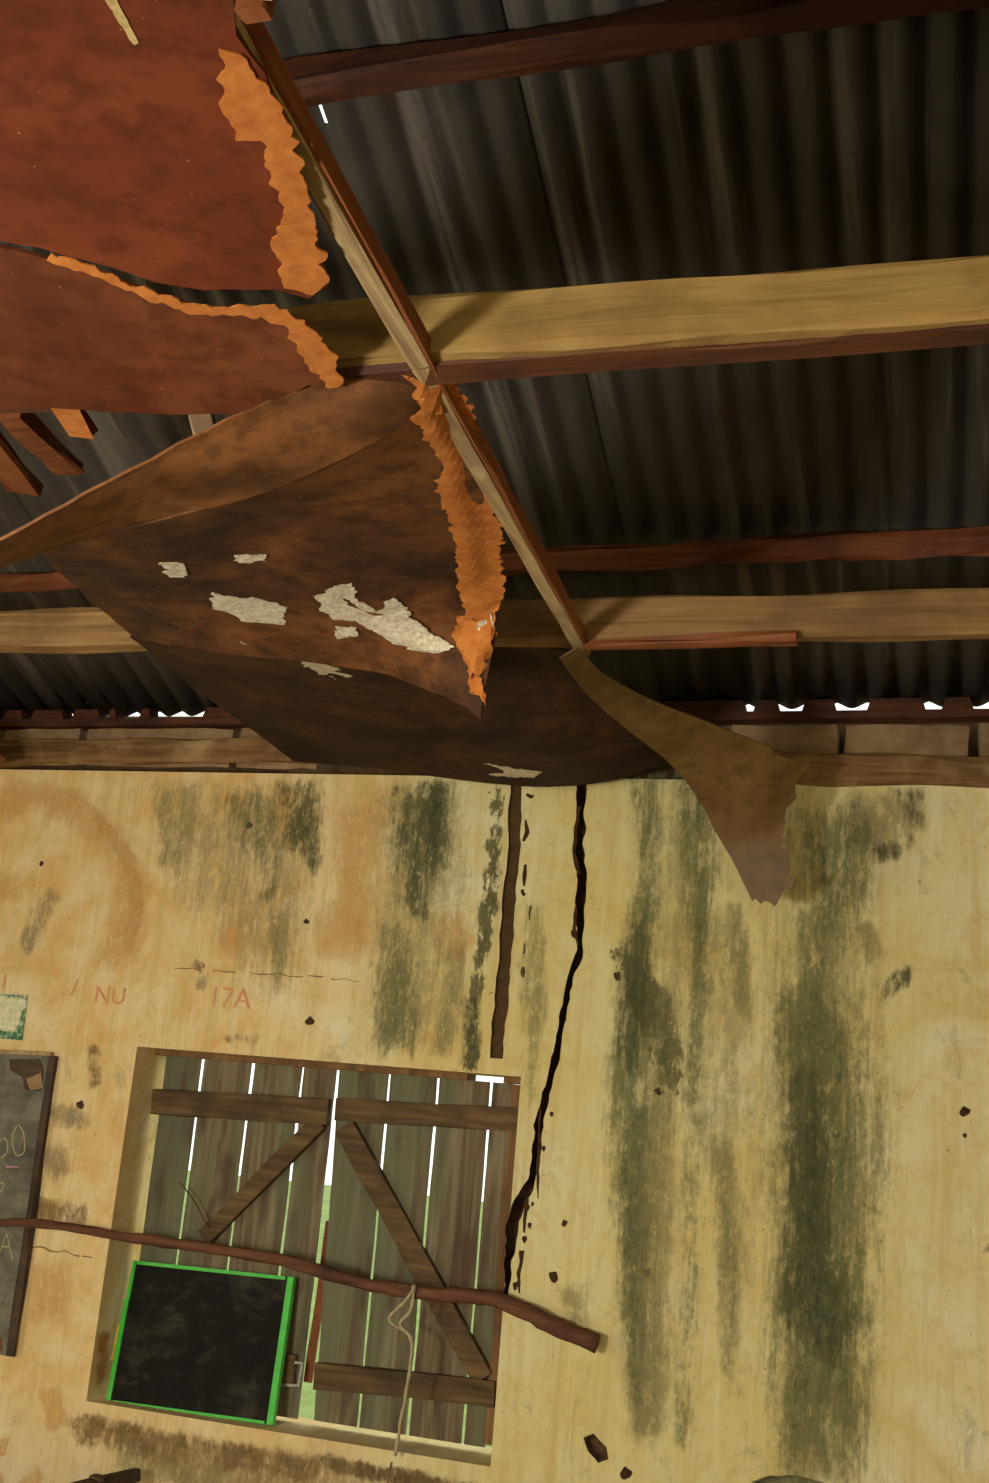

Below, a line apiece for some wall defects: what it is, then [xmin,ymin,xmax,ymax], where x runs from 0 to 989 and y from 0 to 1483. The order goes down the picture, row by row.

peeling [158,562,187,578]
peeling [209,592,287,625]
peeling [233,554,266,563]
peeling [300,661,352,680]
peeling [314,583,455,653]
leakage [391,780,447,920]
leakage [374,925,417,1055]
leakage [437,788,505,1072]
crack [504,785,587,1295]
leakage [608,774,716,1429]
leakage [773,806,882,1478]
leakage [885,968,910,995]